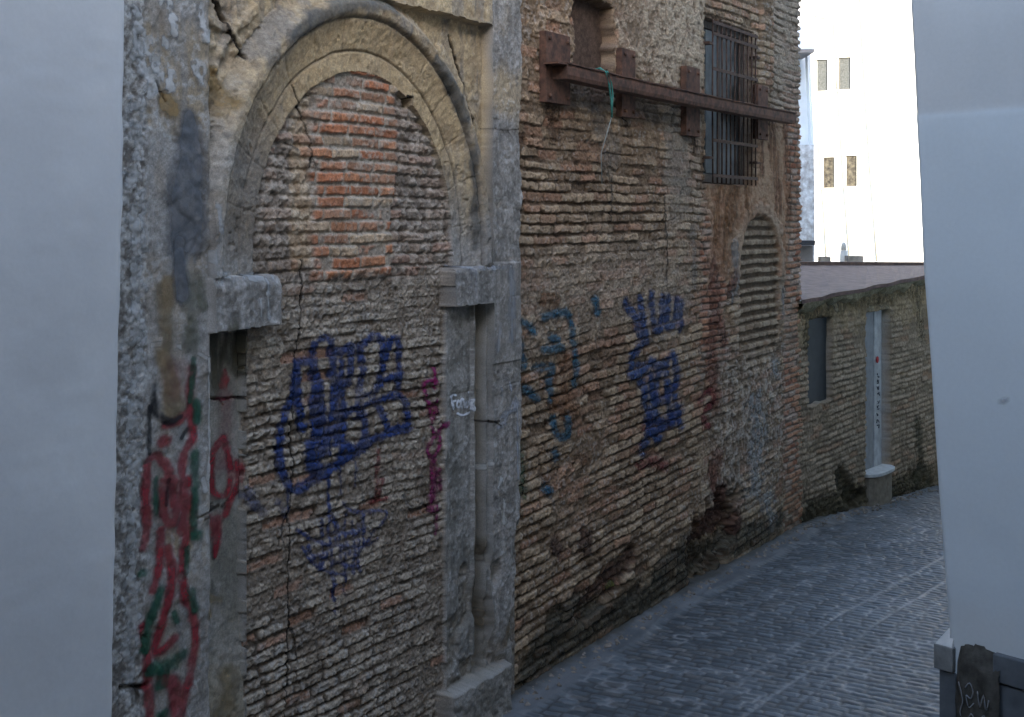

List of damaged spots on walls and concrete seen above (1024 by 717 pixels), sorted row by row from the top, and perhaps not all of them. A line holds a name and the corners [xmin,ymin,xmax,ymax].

crack [211,0,246,59]
crack [293,259,303,363]
water stain [799,468,869,523]
water stain [892,417,933,497]
crack [277,406,302,711]